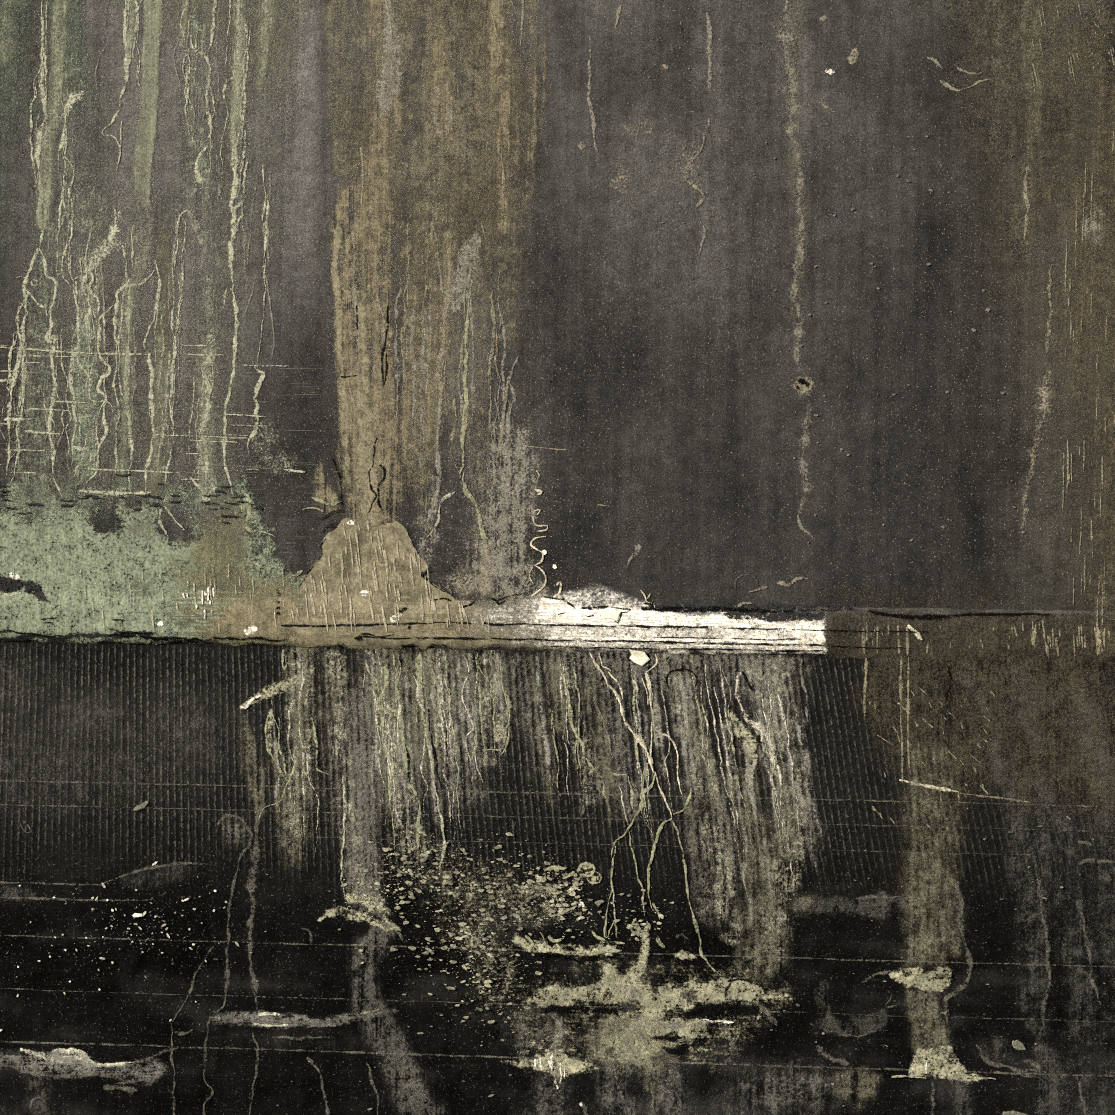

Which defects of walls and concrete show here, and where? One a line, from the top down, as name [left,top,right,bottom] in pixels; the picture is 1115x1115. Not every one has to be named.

damp [0,0,304,517]
damp [302,497,344,533]
damp [420,0,1115,993]
damp [211,649,521,1115]
damp [505,903,792,1115]
damp [743,1075,835,1115]
damp [891,1045,996,1083]